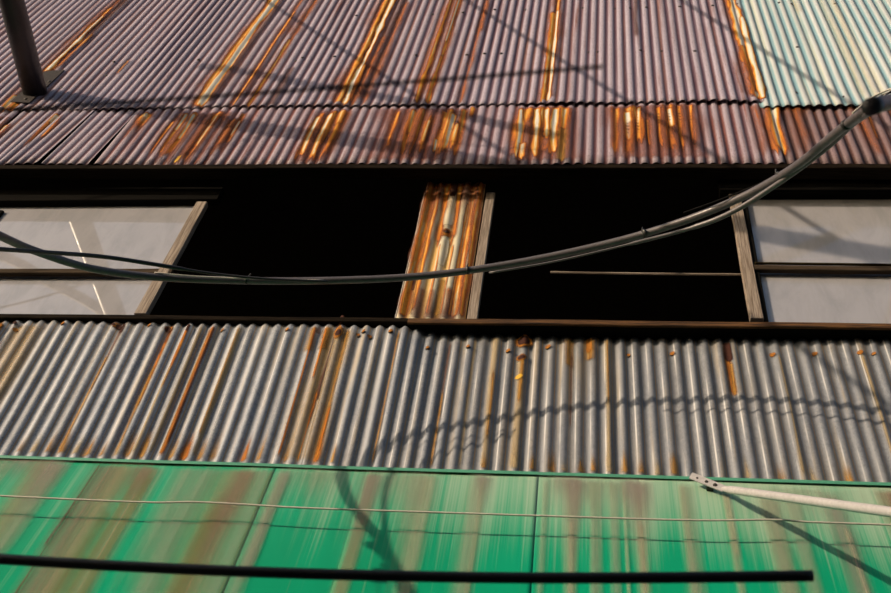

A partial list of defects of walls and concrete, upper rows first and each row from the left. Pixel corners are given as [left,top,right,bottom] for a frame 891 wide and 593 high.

rust [42,0,126,72]
rust [151,0,317,164]
rust [294,0,409,162]
rust [381,0,489,160]
rust [509,0,572,160]
rust [606,104,702,157]
rust [724,0,788,155]
rust [396,181,486,319]
rust [278,315,372,462]
rust [481,334,532,467]
rust [585,338,593,360]
rust [723,342,737,394]